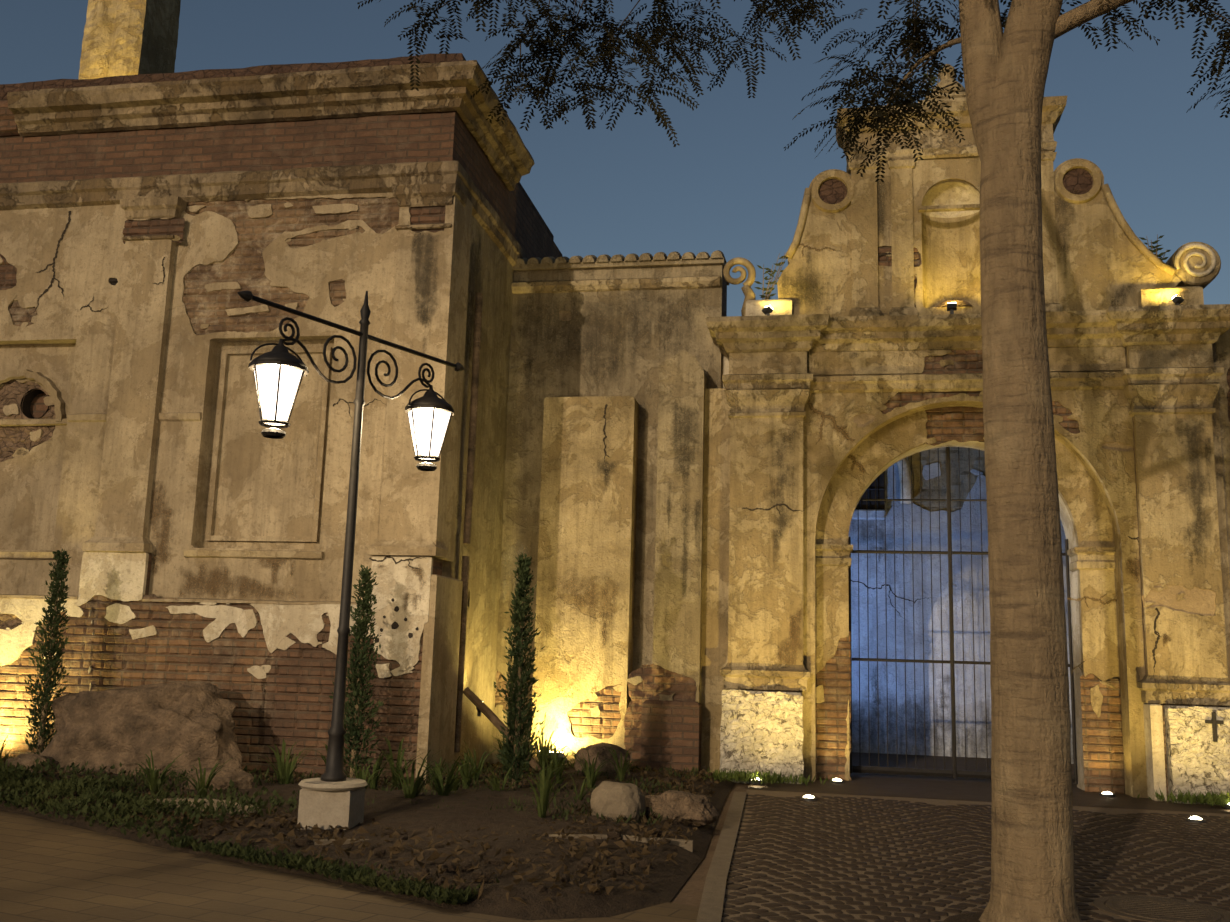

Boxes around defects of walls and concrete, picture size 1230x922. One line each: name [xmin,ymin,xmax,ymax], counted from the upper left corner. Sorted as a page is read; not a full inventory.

flaking render [0,254,38,327]
crack [27,211,108,317]
flaking render [123,198,446,336]
damp [413,233,433,322]
spalling [0,379,56,462]
crack [602,404,610,462]
flaking render [876,391,984,446]
flaking render [0,594,424,783]
spalling [568,663,697,766]
flaking render [815,631,851,780]
flaking render [1080,673,1125,794]
crack [1152,608,1160,672]